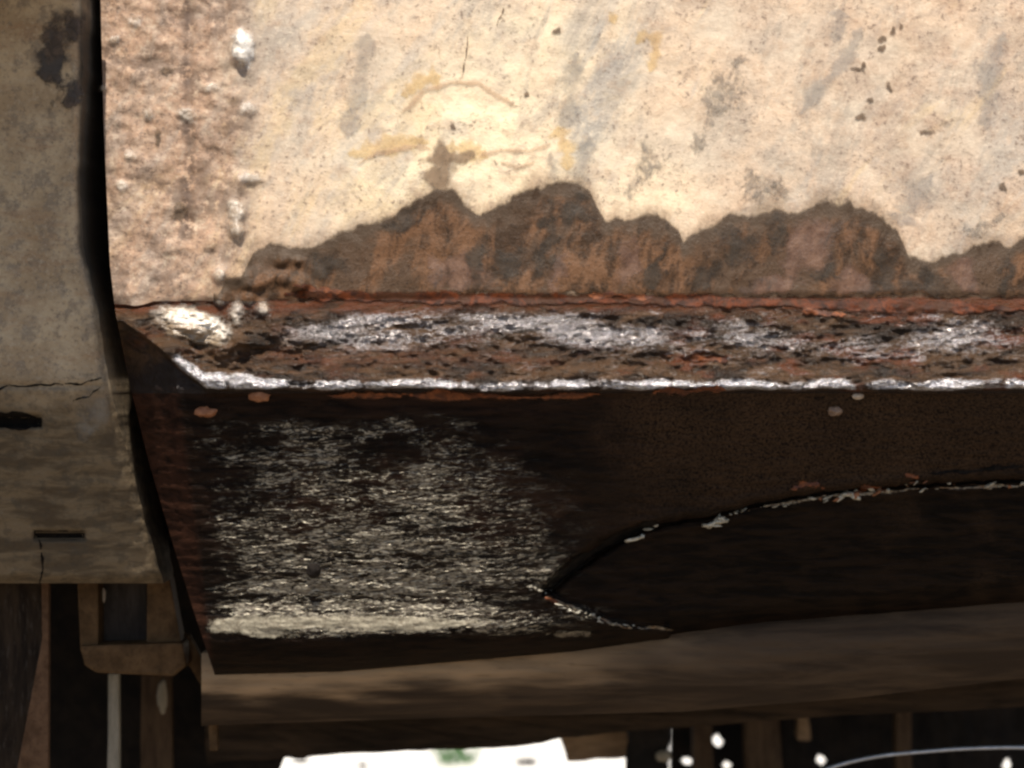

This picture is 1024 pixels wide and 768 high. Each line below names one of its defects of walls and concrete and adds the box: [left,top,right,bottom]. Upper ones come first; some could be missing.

rust [284,284,1024,317]
crack [0,378,102,401]
rust [653,385,726,396]
rust [194,406,218,418]